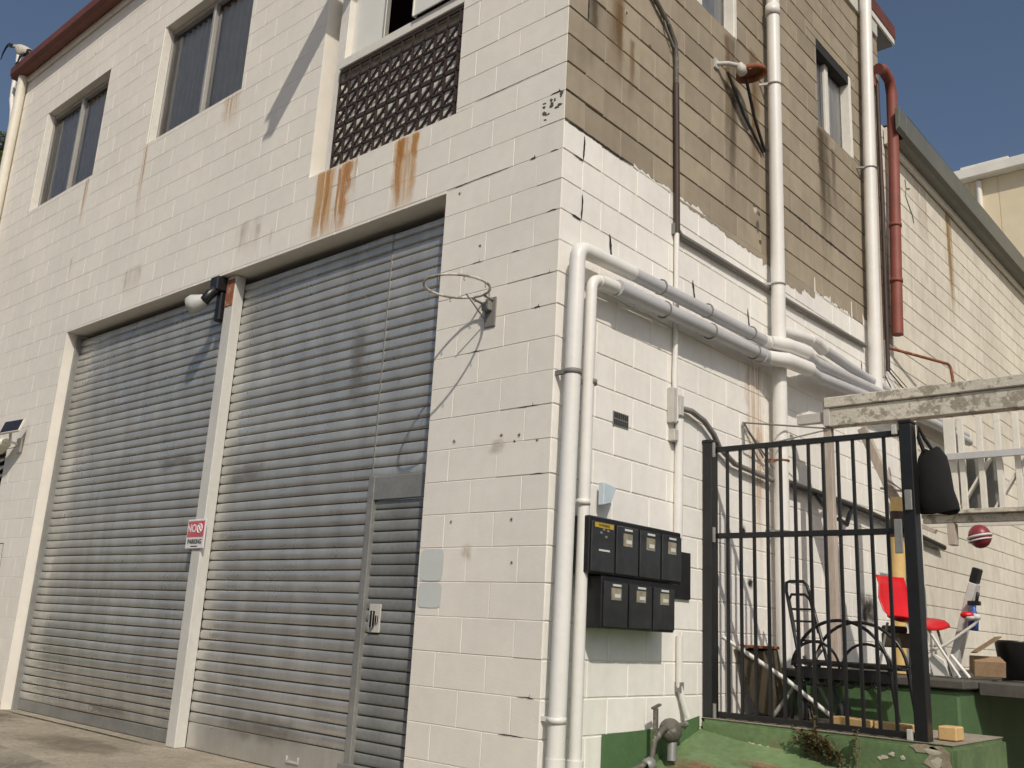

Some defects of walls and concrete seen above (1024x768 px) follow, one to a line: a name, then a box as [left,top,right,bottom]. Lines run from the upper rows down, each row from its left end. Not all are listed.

spalling [542,90,564,121]
rust [394,132,418,191]
rust [313,161,352,223]
peeling [634,164,771,268]
peeling [785,270,868,328]